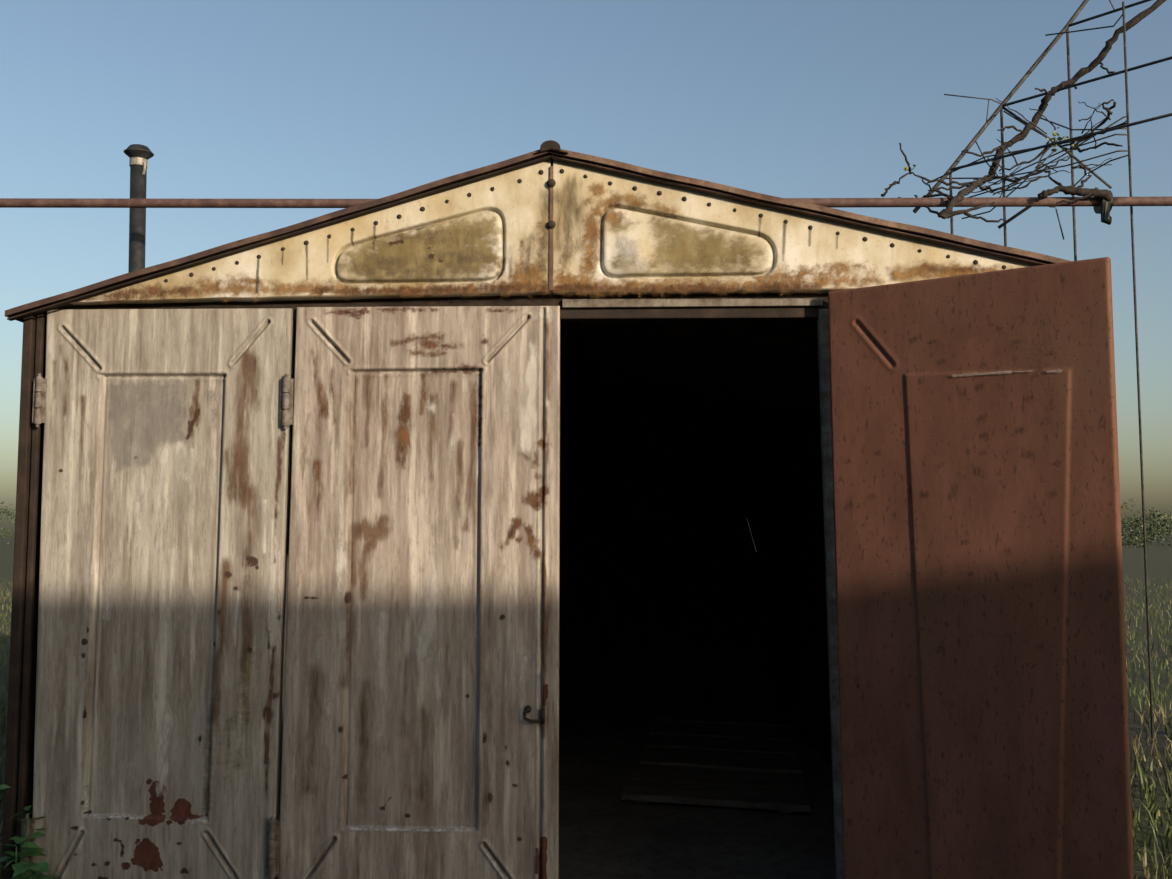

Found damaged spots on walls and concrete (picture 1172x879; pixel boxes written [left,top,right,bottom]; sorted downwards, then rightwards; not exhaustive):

water stain [347,217,511,281]
rust [86,185,999,319]
water stain [651,217,762,273]
rust [212,352,259,720]
rust [275,432,285,528]
rust [351,516,388,591]
rust [350,334,482,506]
rust [501,518,549,677]
rust [522,420,549,511]
rust [263,642,281,793]
peeling [81,709,208,879]